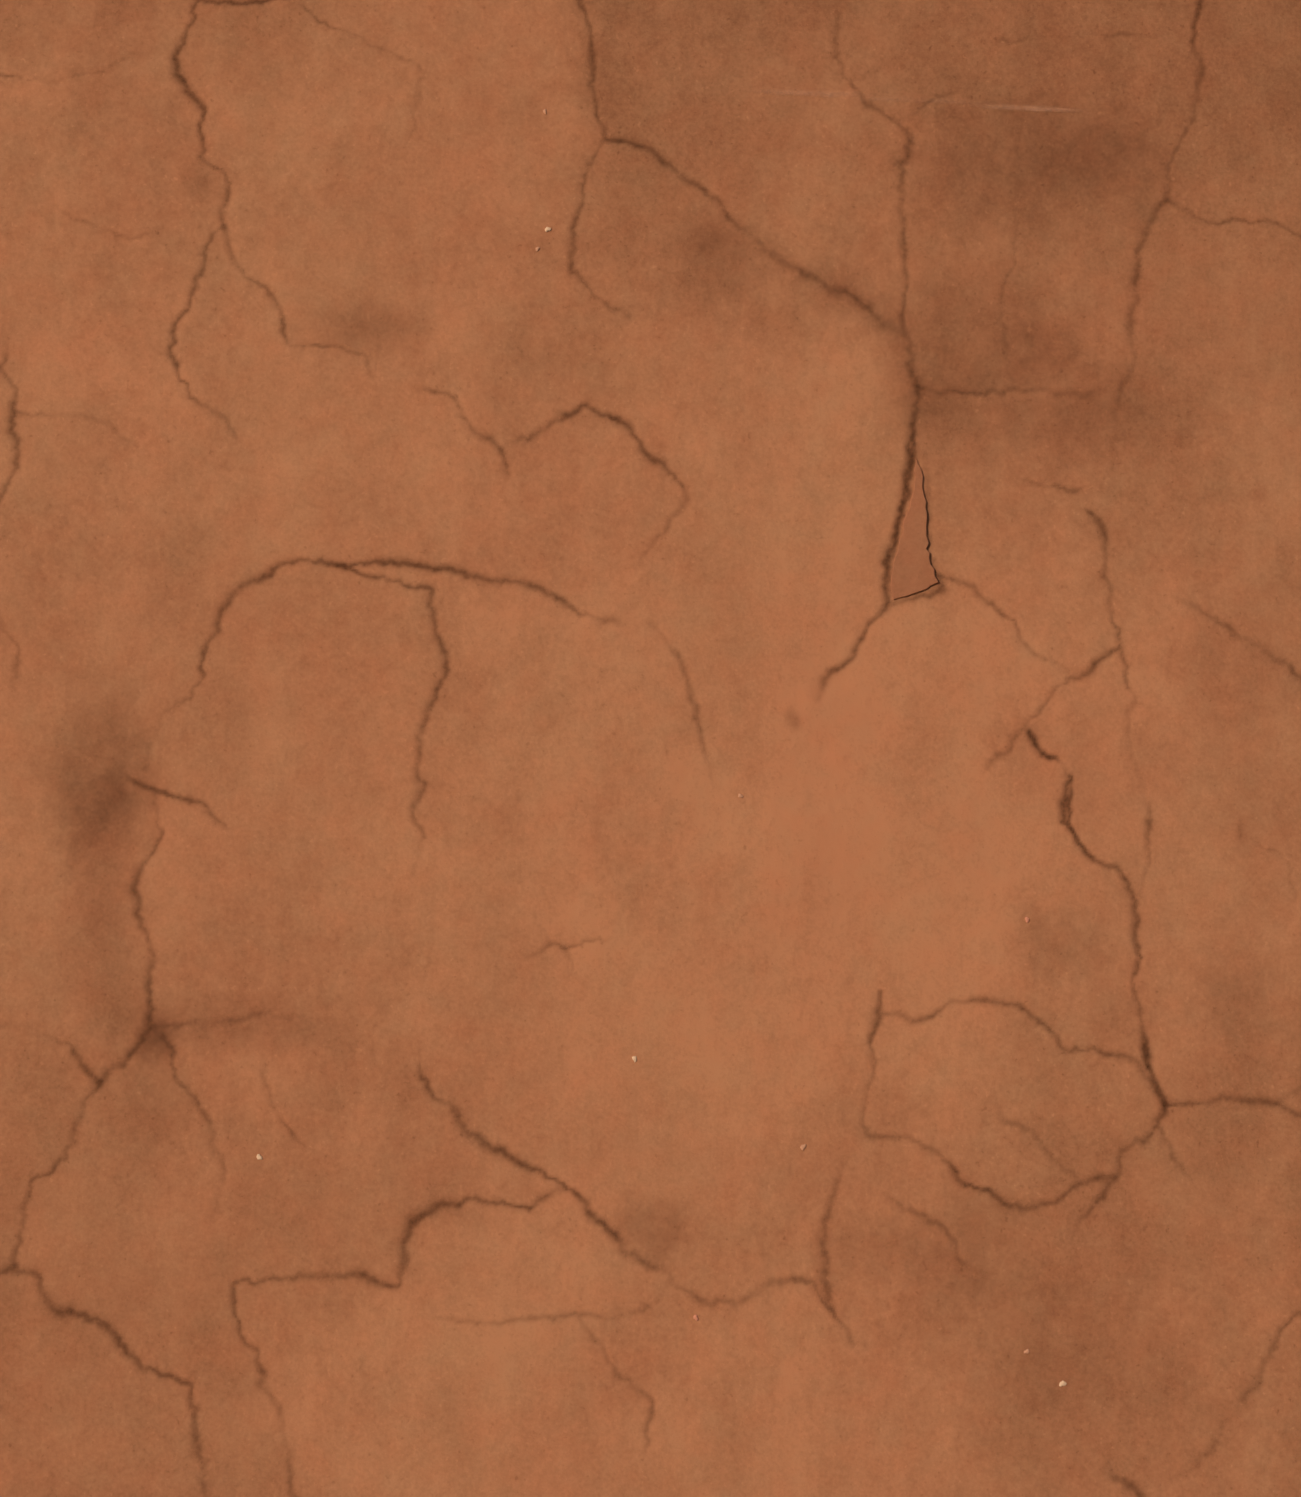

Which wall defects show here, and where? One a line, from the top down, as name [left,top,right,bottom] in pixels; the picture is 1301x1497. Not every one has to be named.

crack [173,51,205,129]
crack [884,422,939,600]
crack [382,561,450,570]
crack [1034,742,1092,858]
crack [1144,1043,1167,1110]